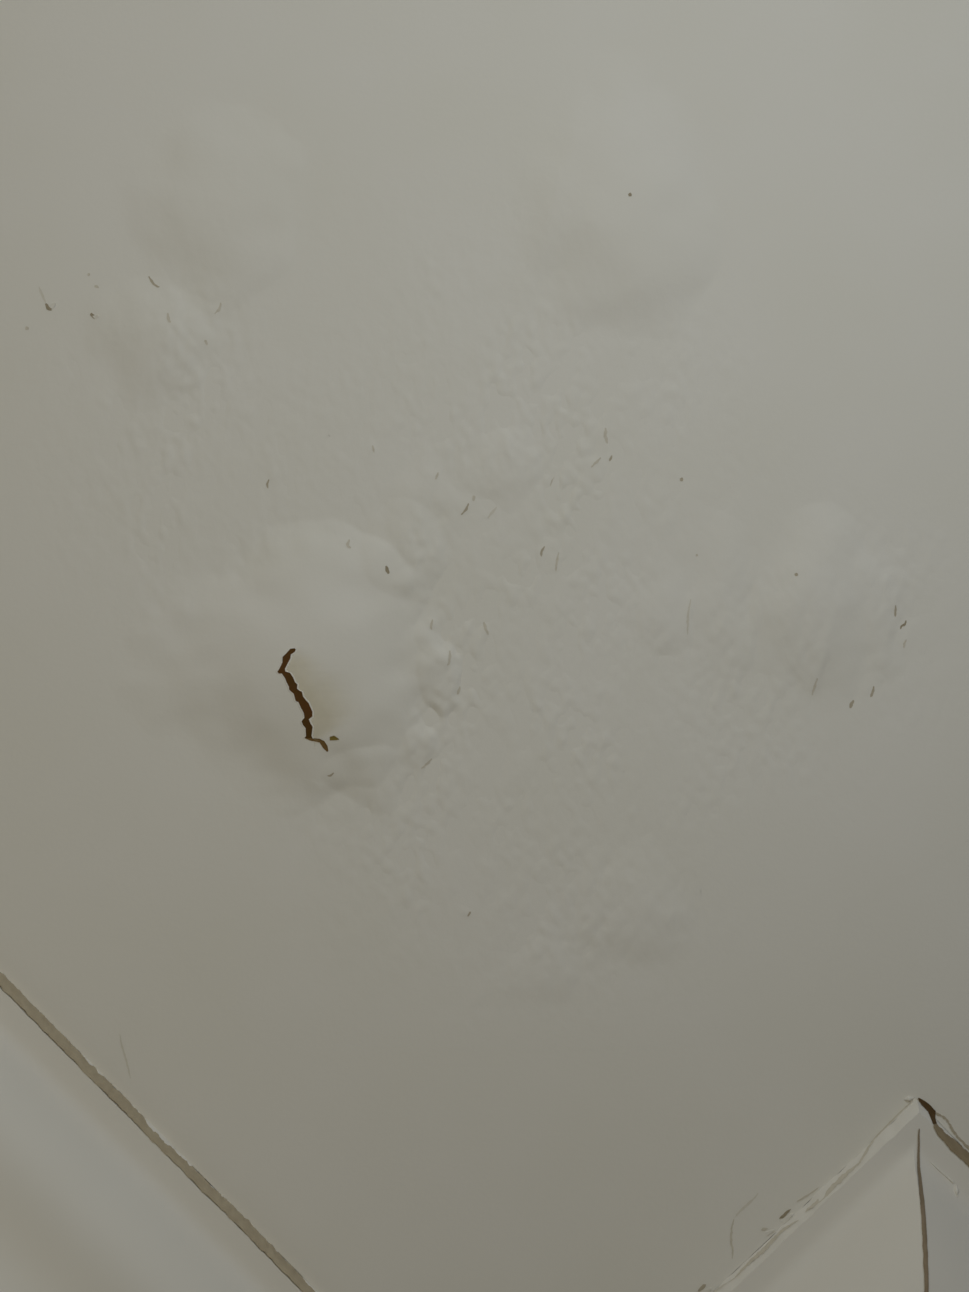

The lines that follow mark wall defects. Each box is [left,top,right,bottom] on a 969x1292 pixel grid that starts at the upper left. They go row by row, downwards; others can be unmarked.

crack [276,647,339,752]